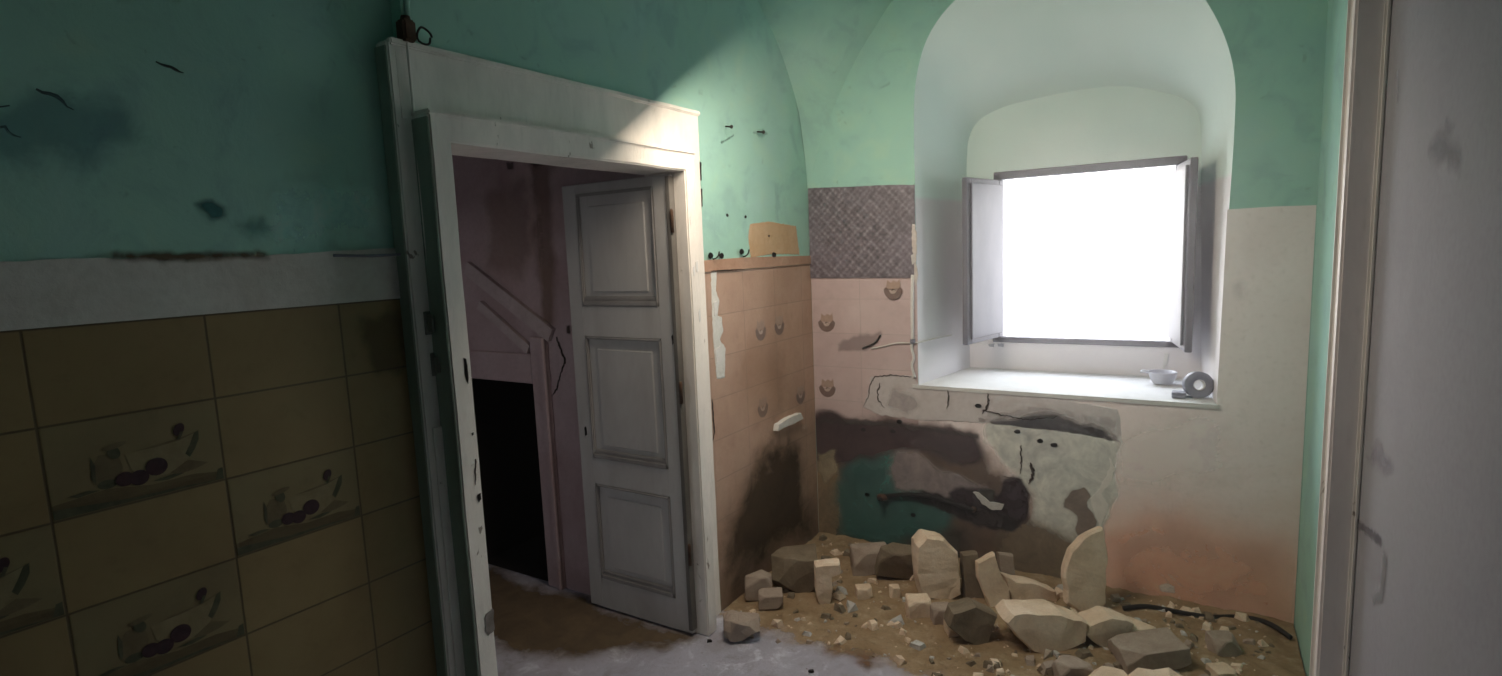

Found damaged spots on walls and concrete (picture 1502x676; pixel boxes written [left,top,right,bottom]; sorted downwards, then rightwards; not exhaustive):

crack [0,88,74,138]
flaking render [748,221,799,257]
leakage [883,448,1004,496]
peeling [863,374,1123,543]